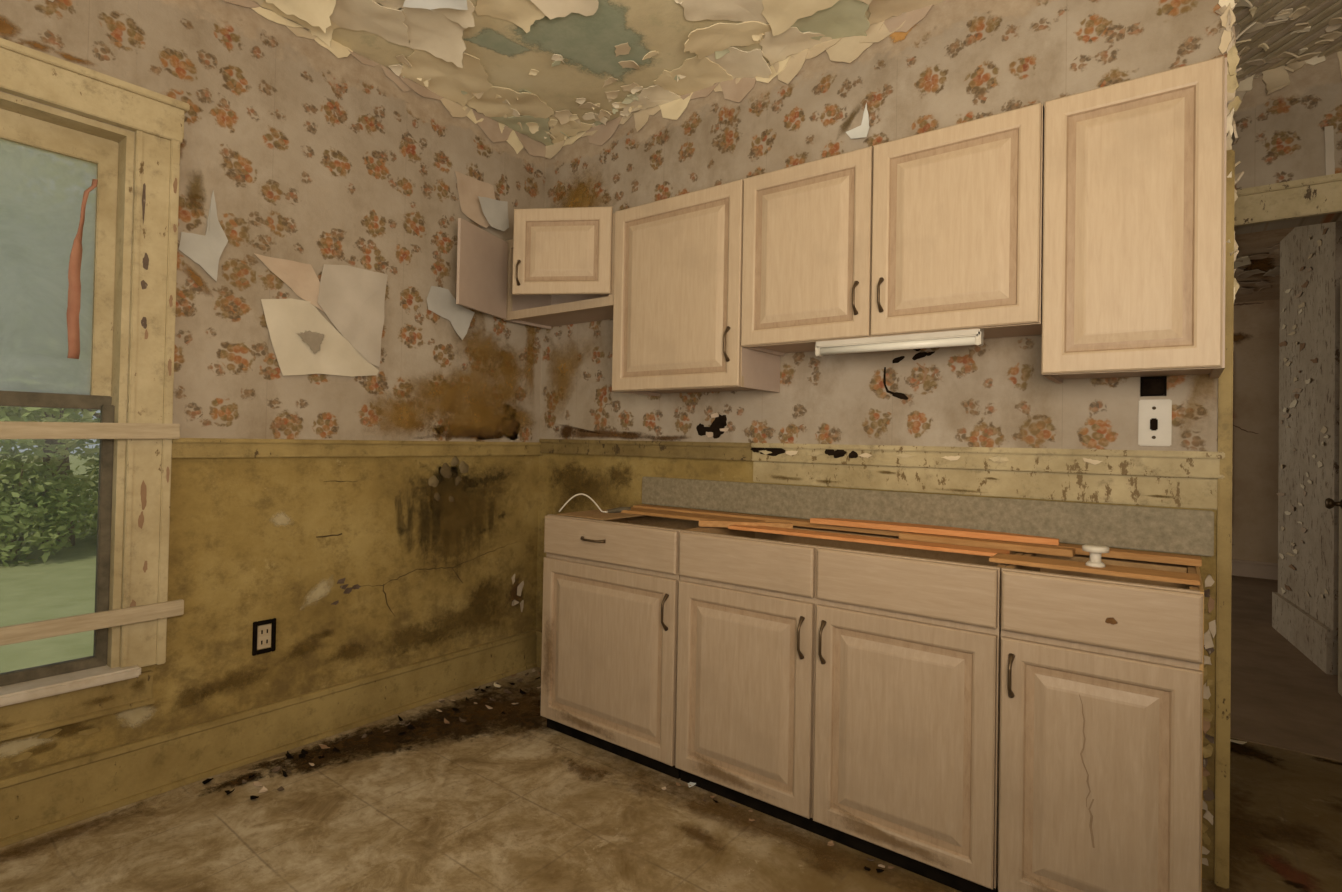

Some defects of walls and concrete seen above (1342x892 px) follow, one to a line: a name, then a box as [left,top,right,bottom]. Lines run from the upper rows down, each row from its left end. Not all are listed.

peeling [223,0,945,159]
flaking render [1214,0,1342,204]
peeling [1226,228,1328,428]
leakage [377,329,535,439]
spalling [696,413,729,439]
peeling [750,447,872,458]
leakage [418,471,504,555]